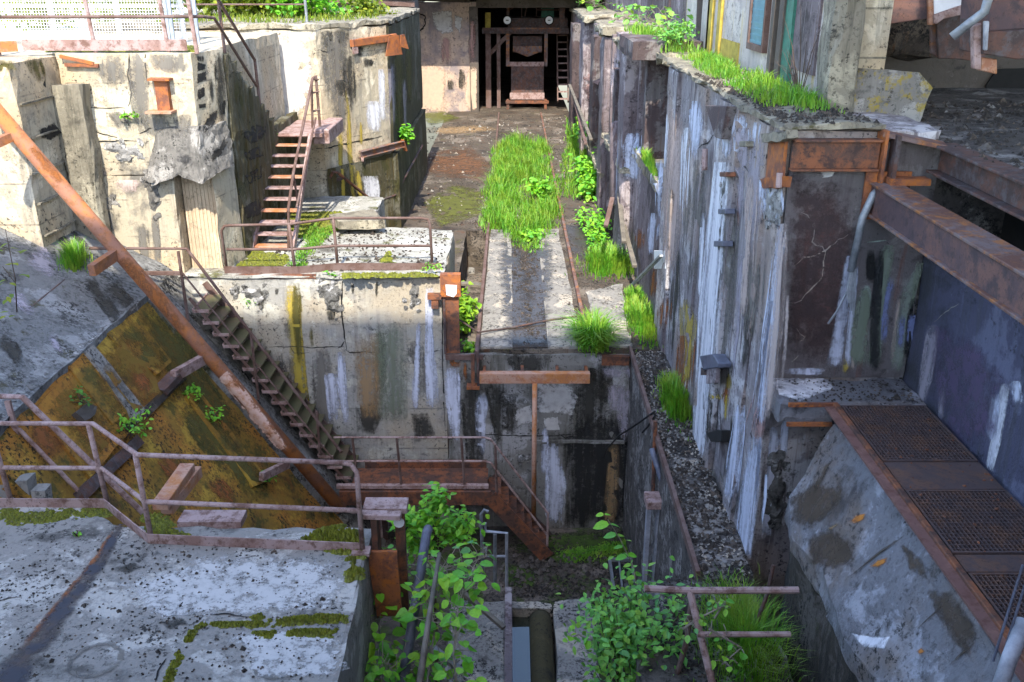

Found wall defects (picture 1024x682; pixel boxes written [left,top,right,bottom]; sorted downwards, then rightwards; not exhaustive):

spalling [212,137,228,160]
crack [795,212,846,303]
crack [274,281,375,353]
water stain [541,364,630,528]